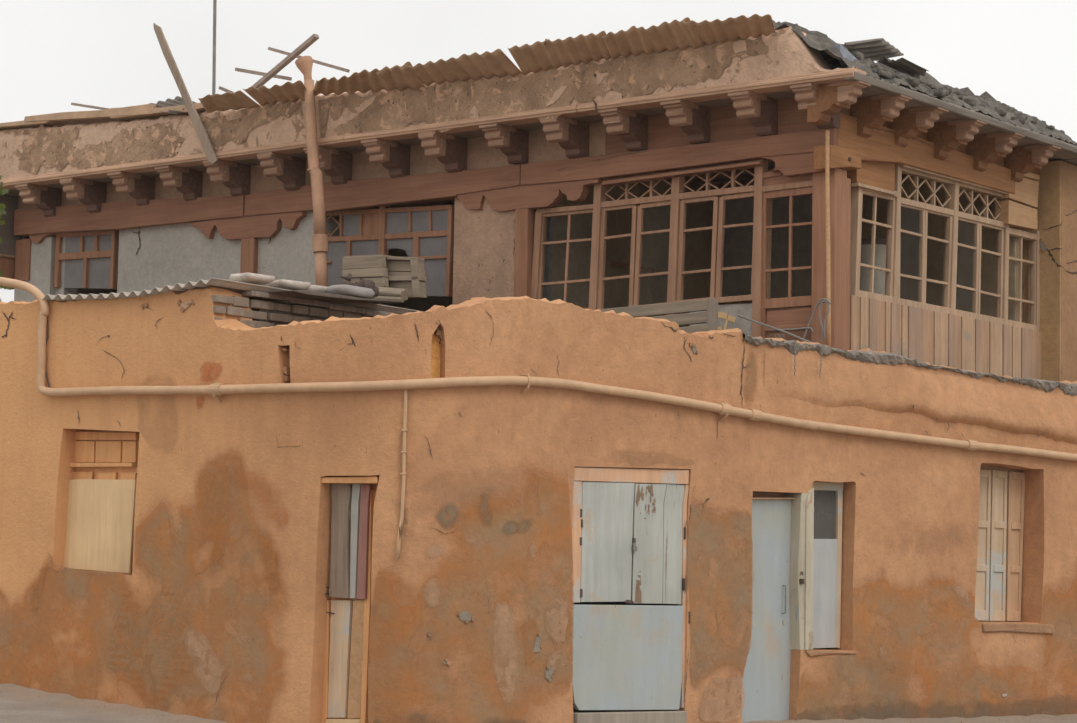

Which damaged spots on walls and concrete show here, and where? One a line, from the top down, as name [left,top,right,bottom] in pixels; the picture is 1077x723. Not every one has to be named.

flaking render [18,123,185,174]
flaking render [200,100,300,151]
flaking render [327,35,768,140]
crack [1043,210,1077,274]
crack [1,311,16,338]
crack [661,321,778,410]
leakage [0,455,287,723]
leakage [368,475,574,723]
leakage [687,506,754,723]
leakage [795,579,1077,721]